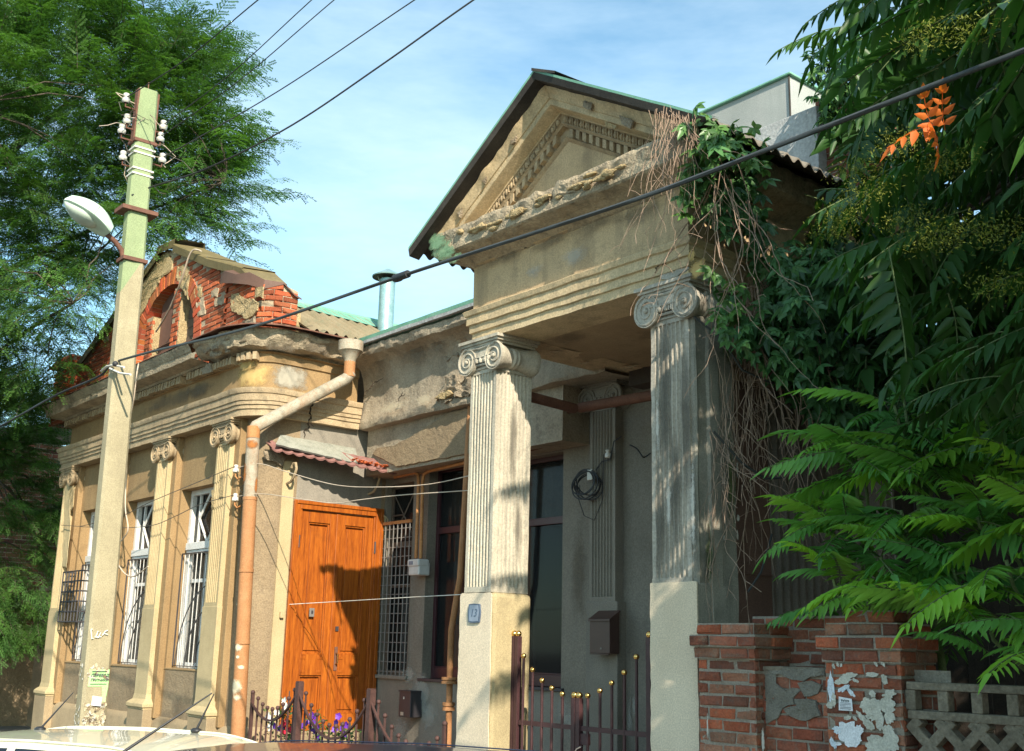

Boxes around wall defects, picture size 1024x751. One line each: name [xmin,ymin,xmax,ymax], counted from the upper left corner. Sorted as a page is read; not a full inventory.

peeling [140,252,264,323]
crack [303,403,314,437]
peeling [373,375,471,467]
peeling [765,666,826,724]
peeling [860,689,899,751]